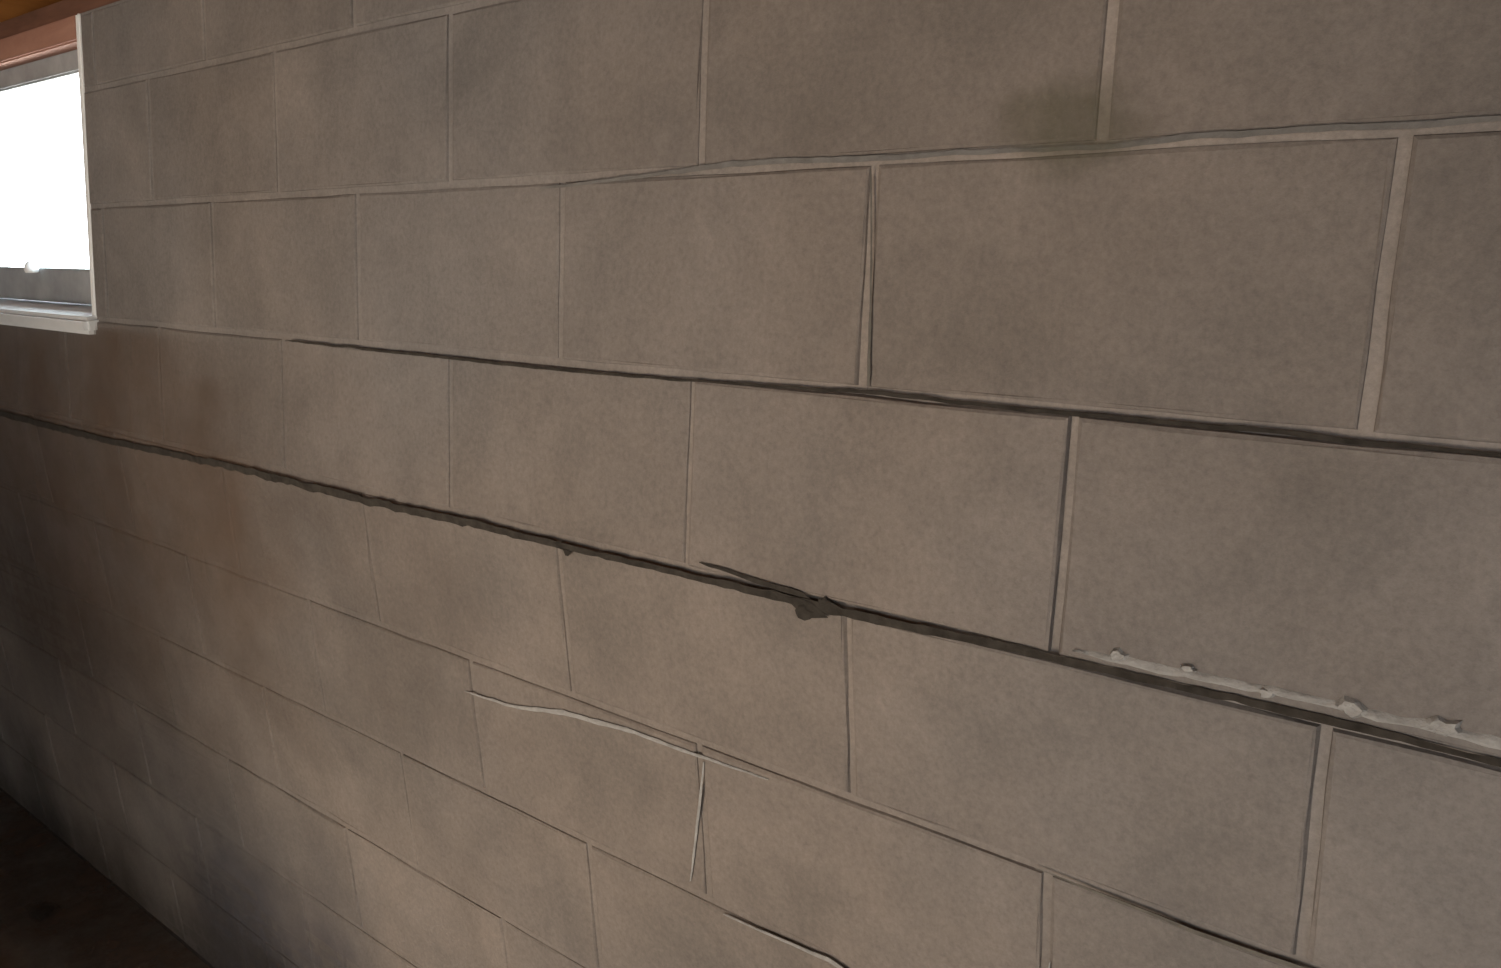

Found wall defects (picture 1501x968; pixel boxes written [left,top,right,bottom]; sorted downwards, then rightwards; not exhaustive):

crack [0,410,1501,767]
water stain [0,779,231,968]
crack [465,691,769,881]
crack [723,914,843,968]
crack [1035,868,1305,968]